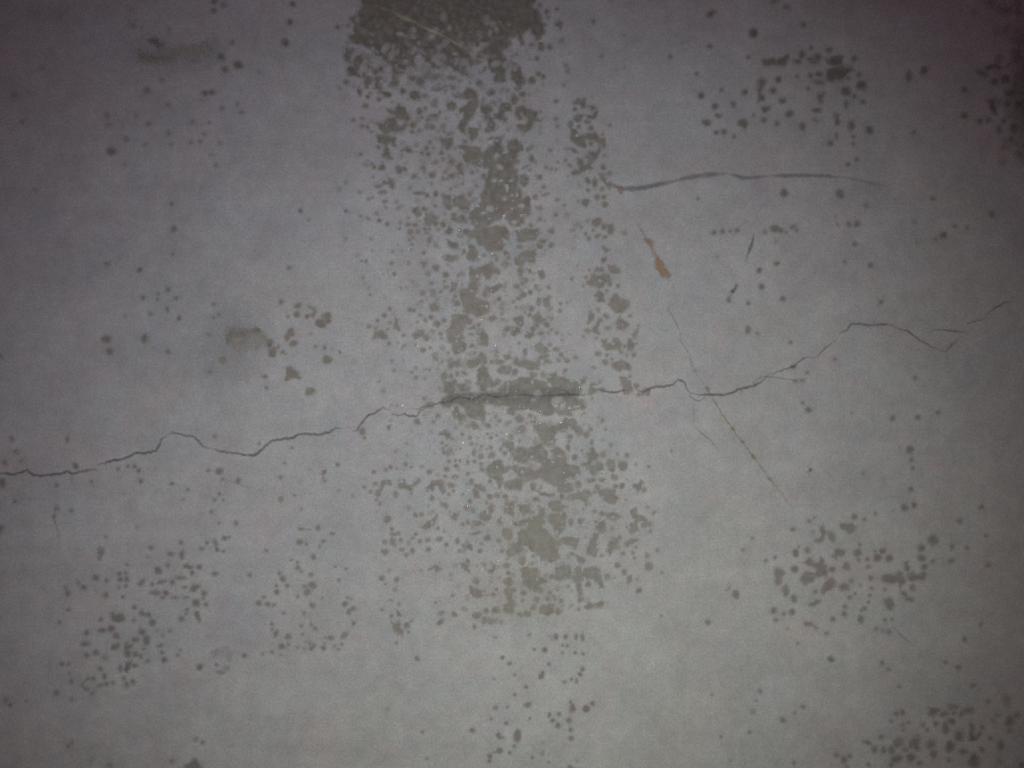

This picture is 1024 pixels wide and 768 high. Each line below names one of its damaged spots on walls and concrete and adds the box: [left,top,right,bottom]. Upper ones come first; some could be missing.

damp [692,26,877,169]
damp [240,0,665,660]
damp [49,460,242,704]
damp [762,510,972,648]